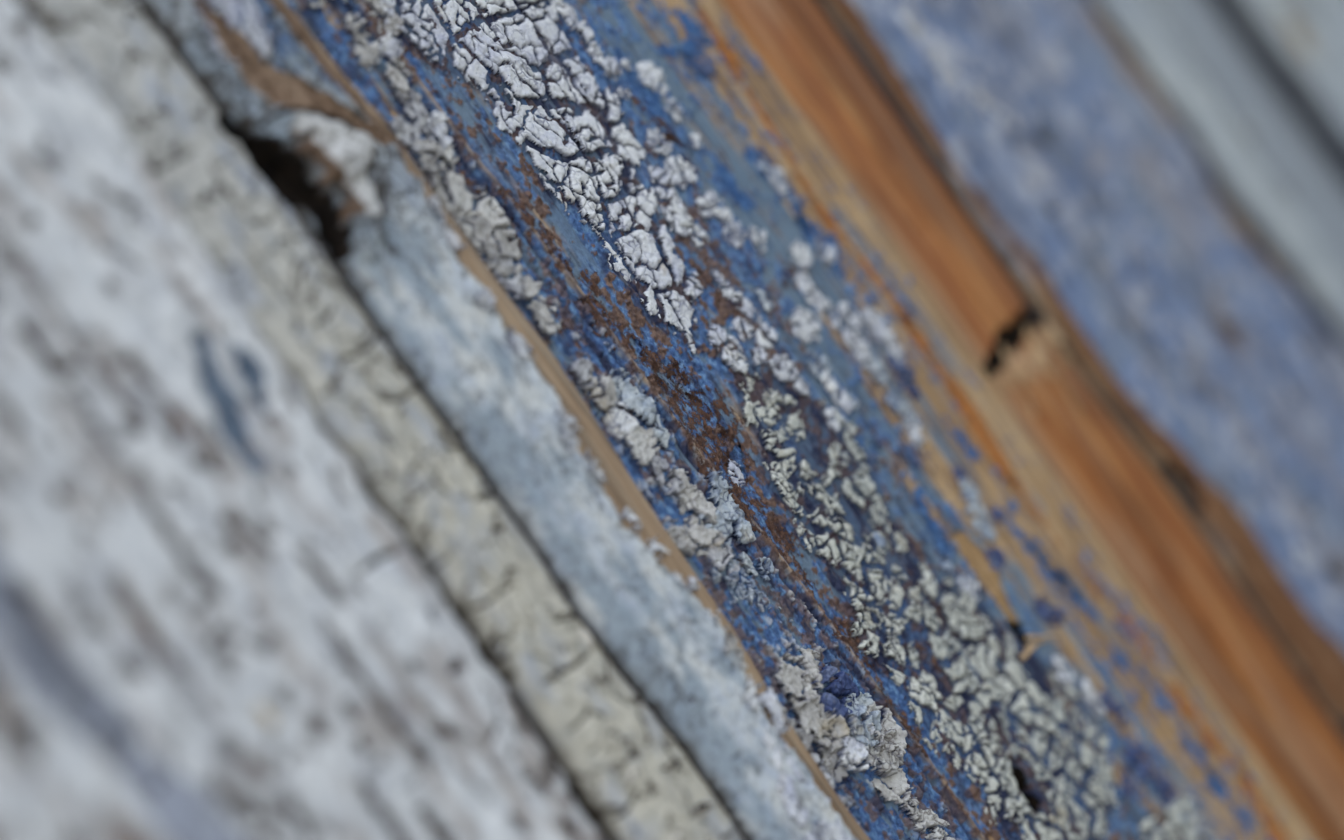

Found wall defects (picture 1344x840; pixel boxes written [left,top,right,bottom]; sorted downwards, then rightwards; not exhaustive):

crack [99,0,743,840]
peeling [190,0,1216,840]
crack [981,317,1039,378]